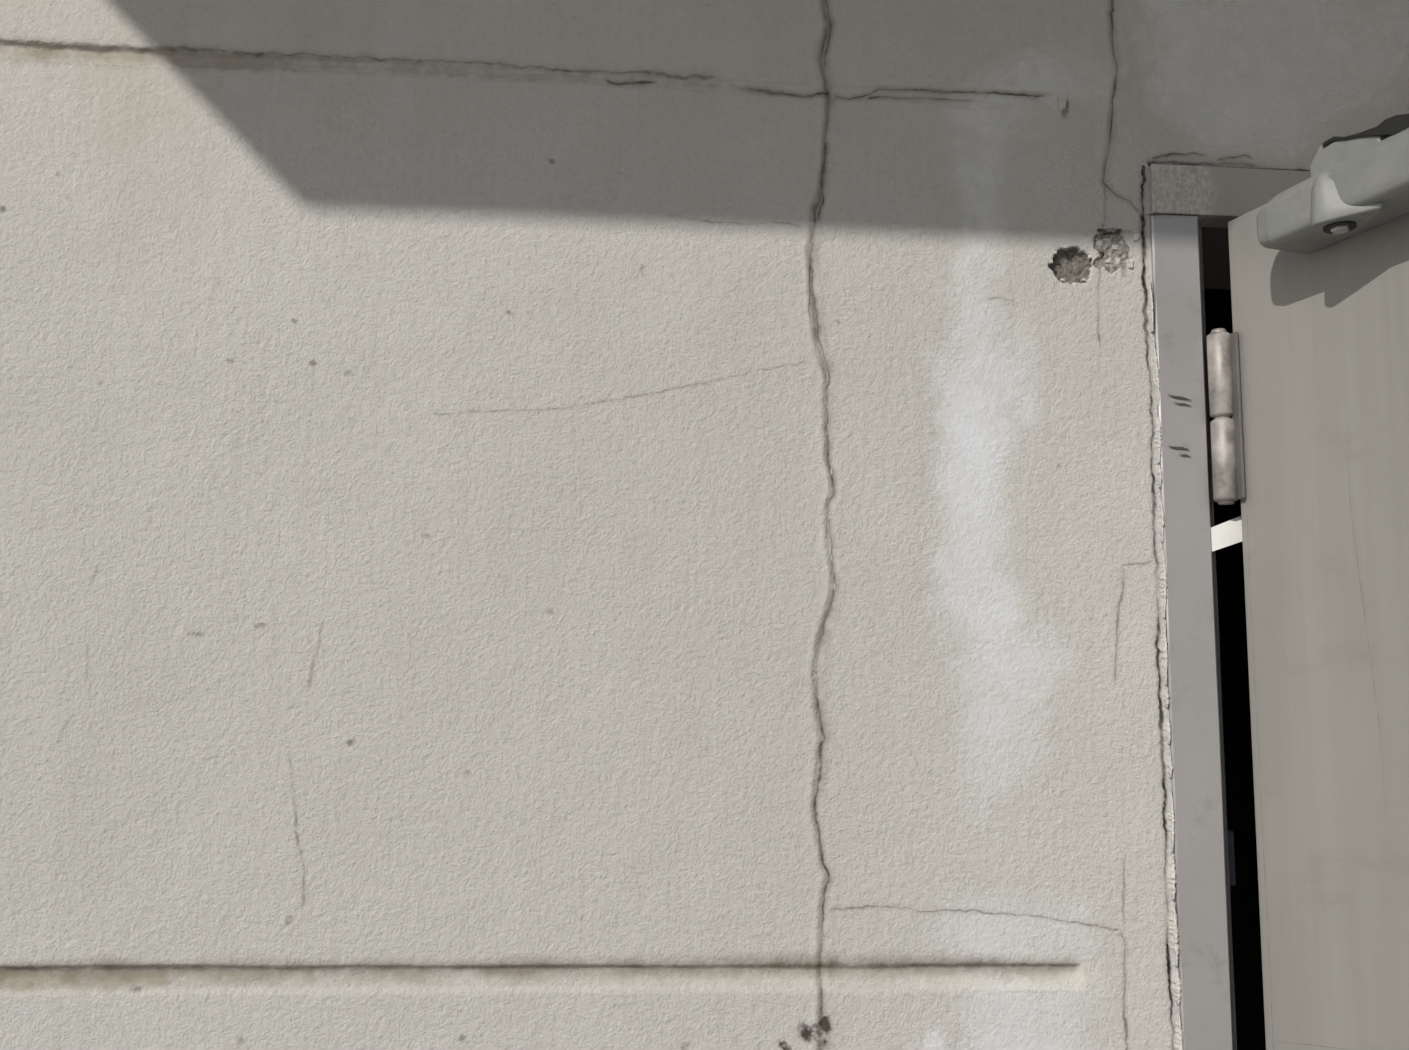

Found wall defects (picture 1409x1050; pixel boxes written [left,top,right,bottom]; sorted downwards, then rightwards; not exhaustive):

crack [915,89,1040,100]
crack [809,146,834,487]
spalling [1049,228,1140,283]
crack [1103,6,1306,575]
crack [1155,617,1163,729]
peeling [1147,278,1183,1050]
crack [814,698,830,924]
crack [1160,763,1168,874]
crack [96,965,204,973]
crack [462,963,560,971]
crack [736,960,1024,1034]
crack [1166,914,1174,1046]